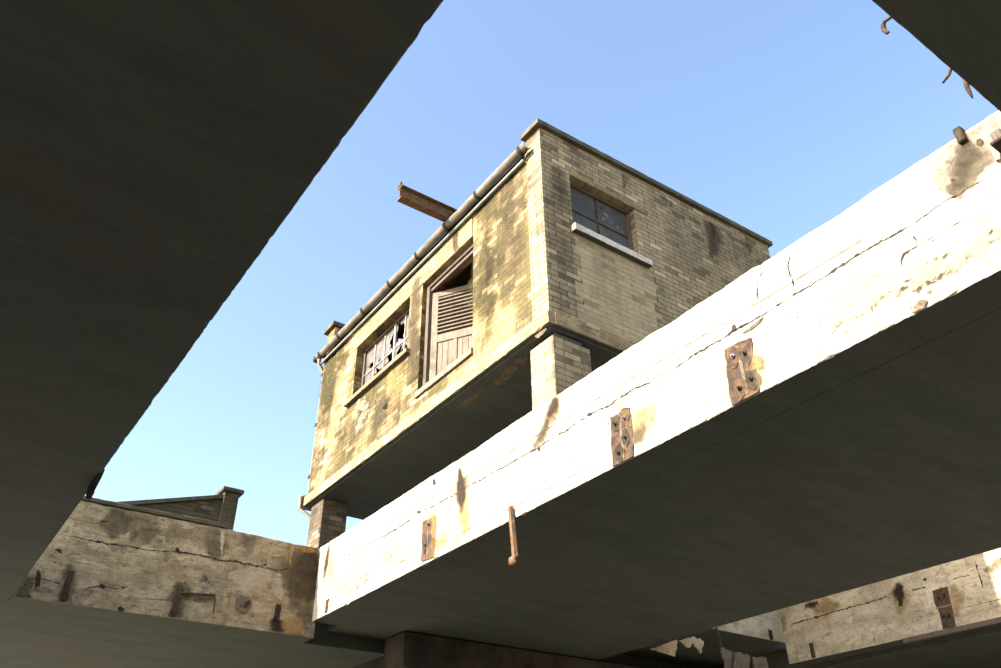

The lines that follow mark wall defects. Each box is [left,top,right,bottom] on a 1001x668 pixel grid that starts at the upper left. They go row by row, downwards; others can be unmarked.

water stain [948,141,973,198]
crack [322,180,998,570]
water stain [537,397,559,442]
rust [611,402,655,464]
water stain [101,509,128,538]
crack [62,534,288,572]